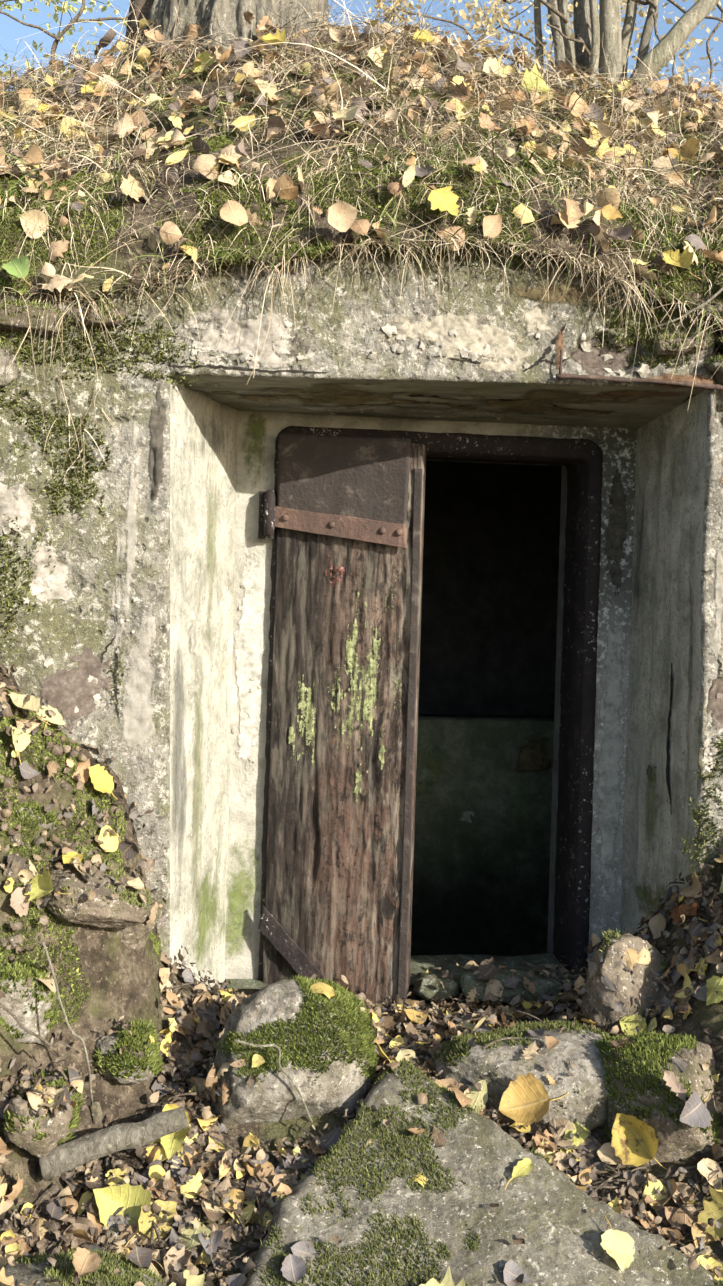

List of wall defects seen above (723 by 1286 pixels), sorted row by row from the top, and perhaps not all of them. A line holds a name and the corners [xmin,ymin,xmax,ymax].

corrosion [556,331,723,399]
damp [173,669,187,856]
crack [665,663,673,815]